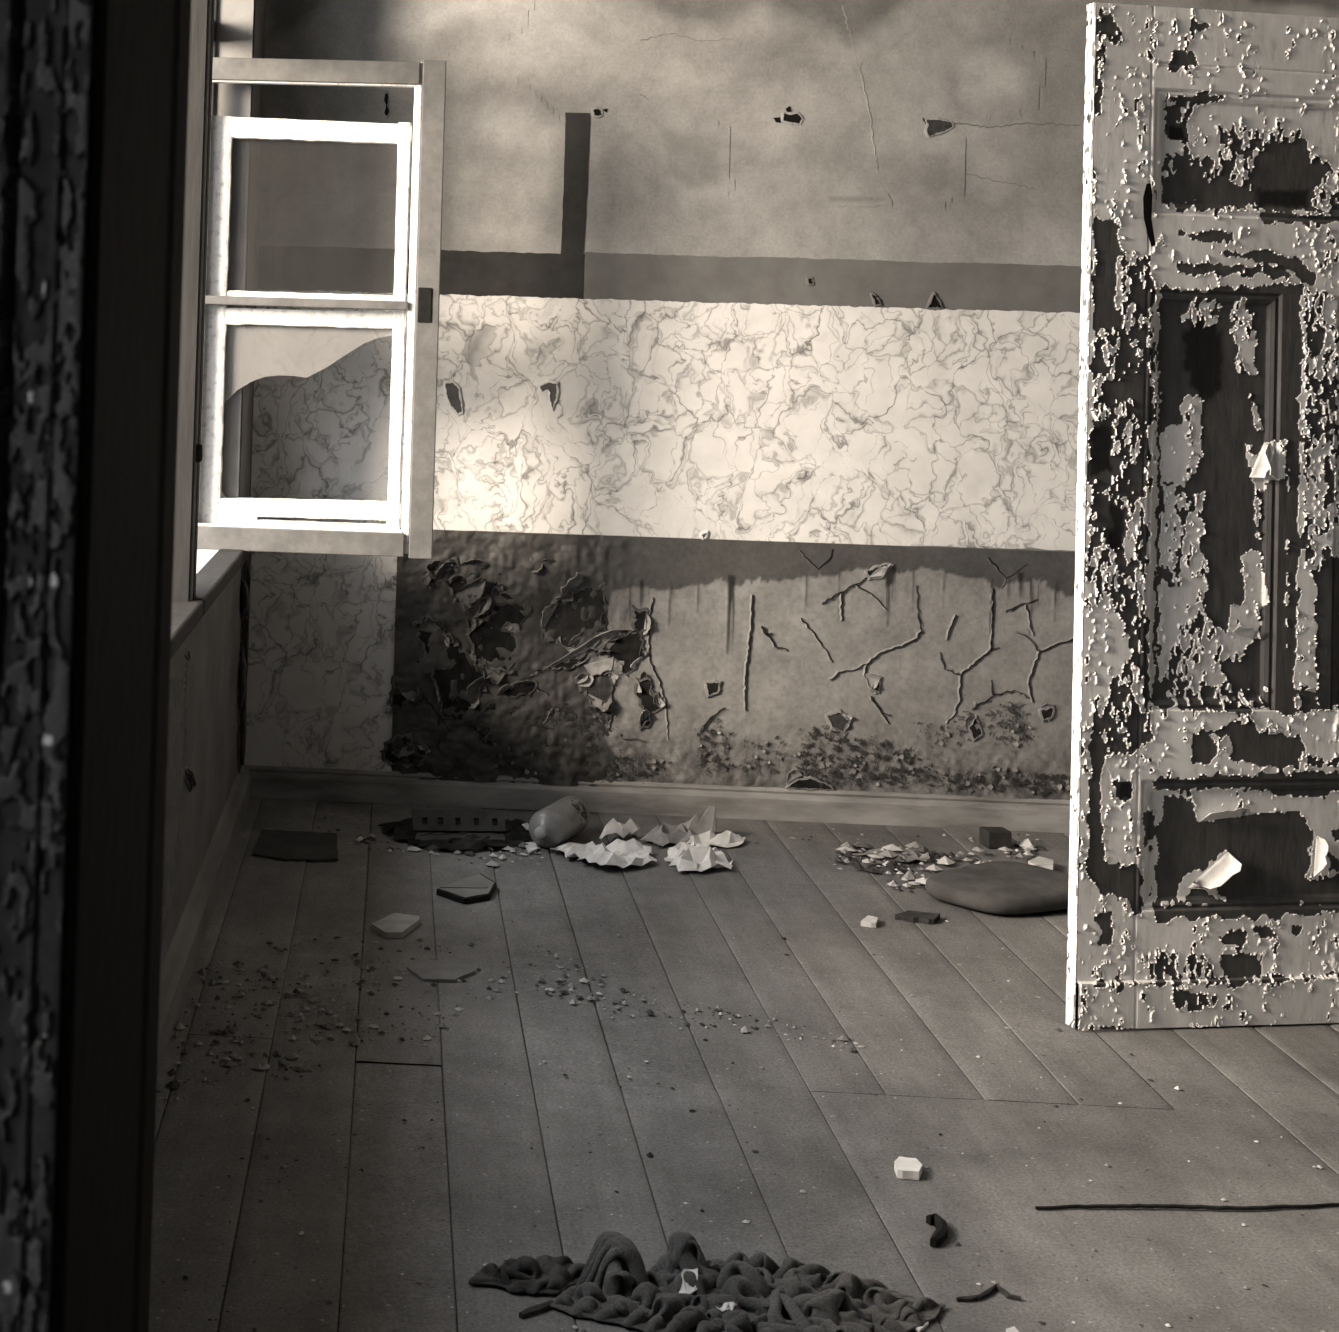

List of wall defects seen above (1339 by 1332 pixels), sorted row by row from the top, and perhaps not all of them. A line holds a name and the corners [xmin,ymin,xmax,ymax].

peeling [1249,442,1278,478]
damp [886,565,894,608]
crack [536,549,1074,743]
peeling [380,557,674,783]
peeling [1187,852,1242,890]
peeling [1313,836,1329,877]